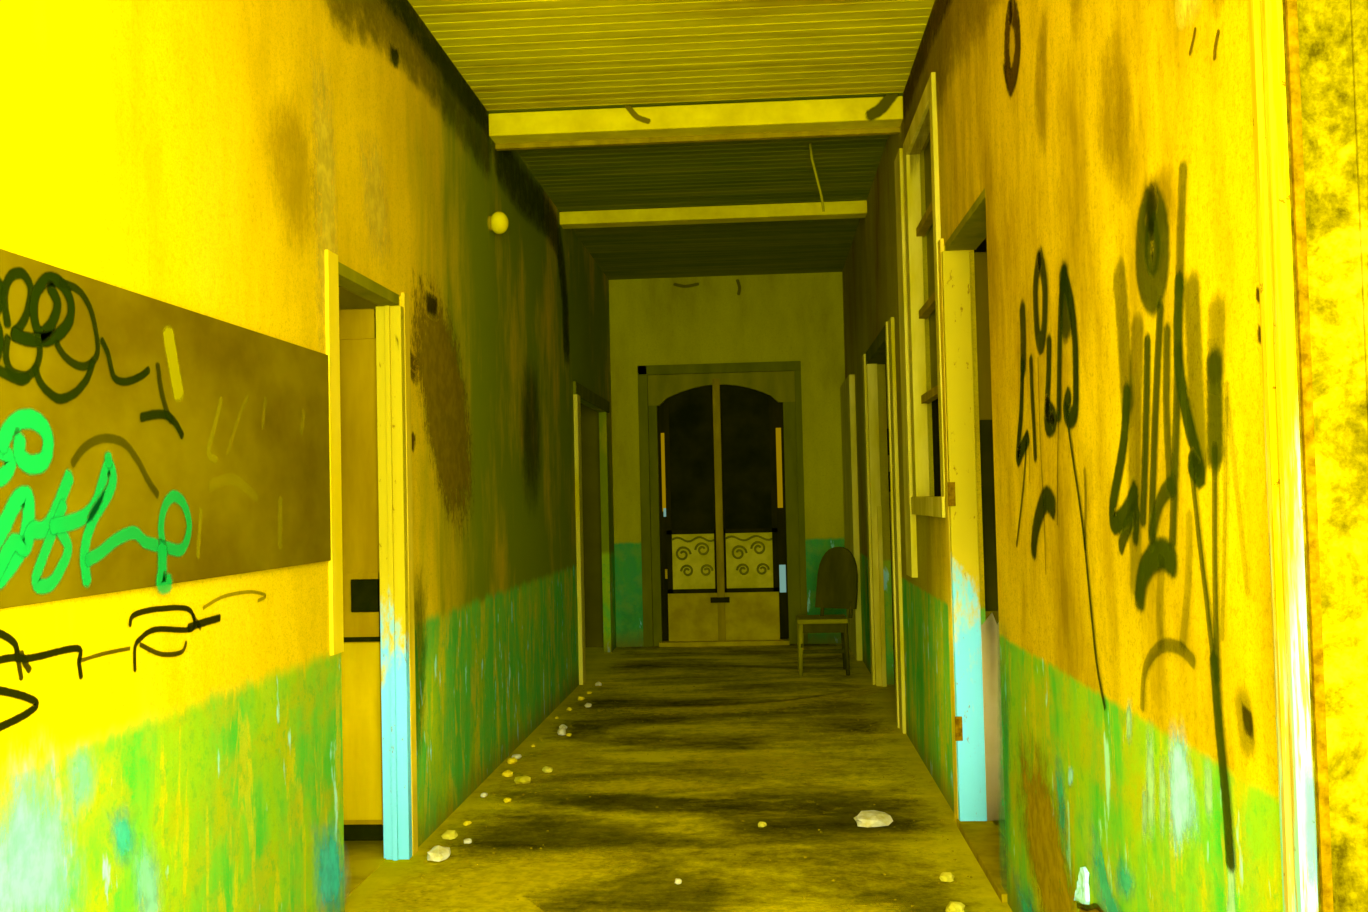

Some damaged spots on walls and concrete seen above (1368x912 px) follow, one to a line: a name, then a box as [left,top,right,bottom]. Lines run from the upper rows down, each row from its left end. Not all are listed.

leakage [329,0,570,361]
leakage [471,791,909,851]
peeling [1000,681,1132,912]
peeling [1143,732,1212,844]